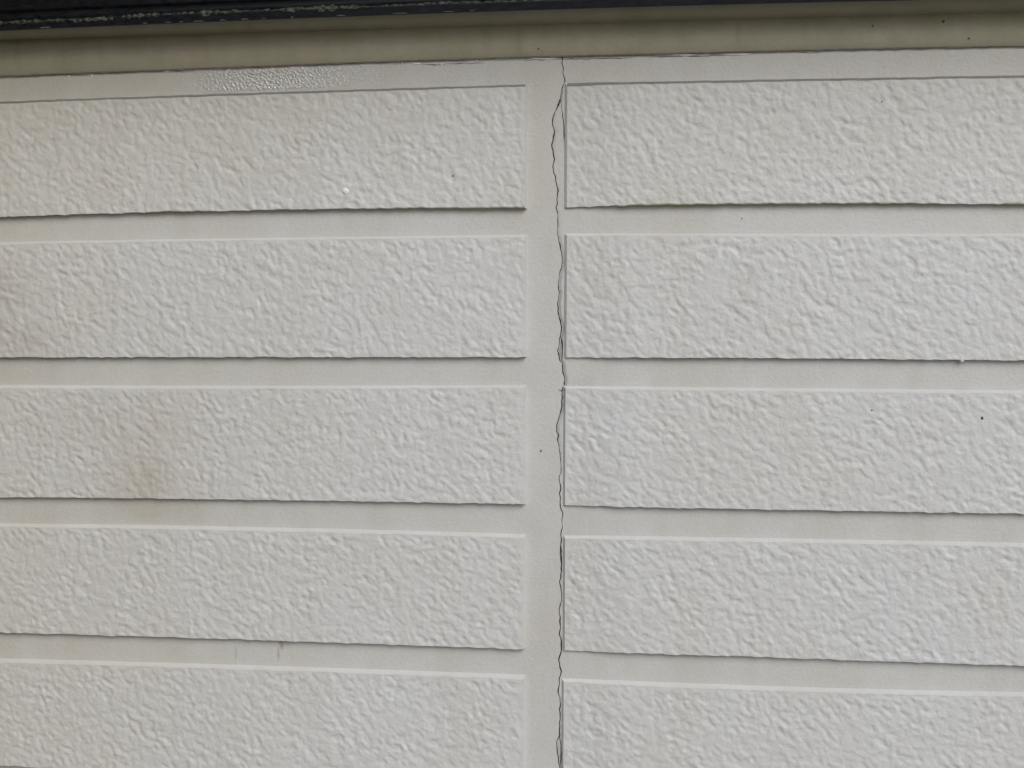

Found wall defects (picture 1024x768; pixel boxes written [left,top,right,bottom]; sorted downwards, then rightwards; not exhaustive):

crack [0,63,341,77]
crack [358,48,902,767]